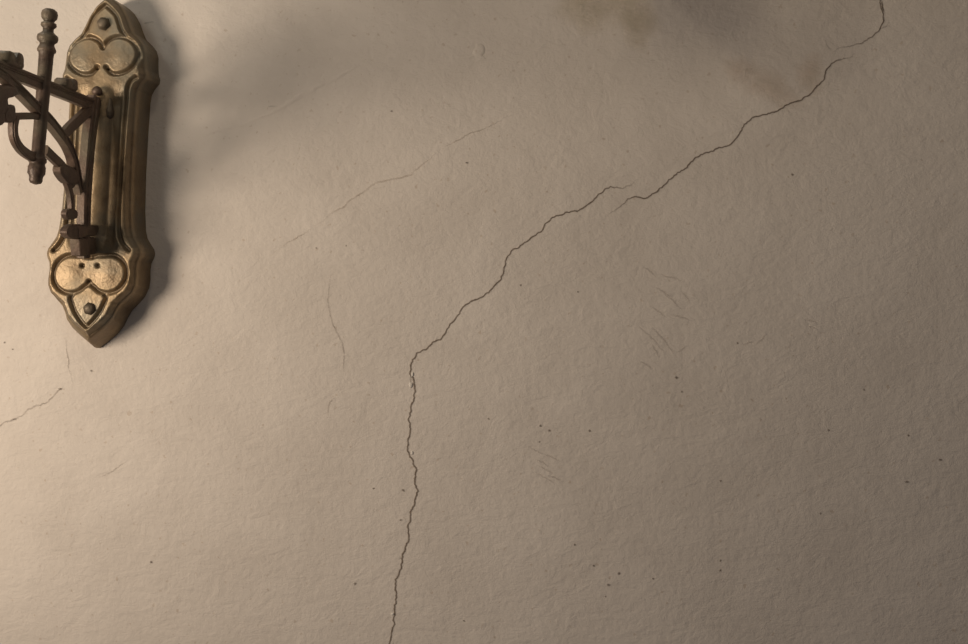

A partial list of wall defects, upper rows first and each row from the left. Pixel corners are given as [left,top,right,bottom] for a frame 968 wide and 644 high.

crack [389,62,834,644]